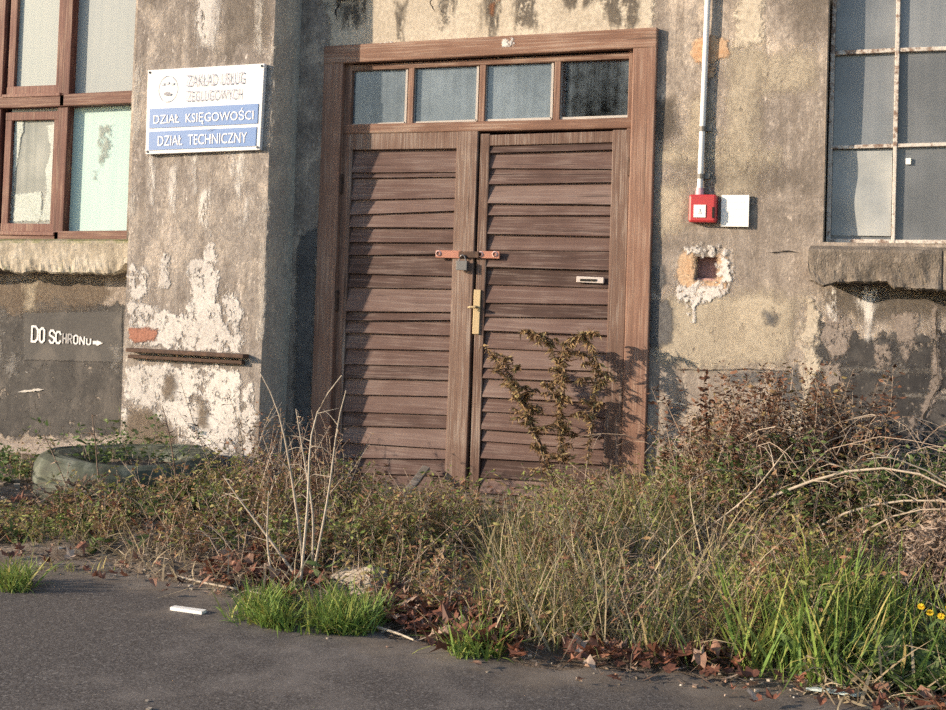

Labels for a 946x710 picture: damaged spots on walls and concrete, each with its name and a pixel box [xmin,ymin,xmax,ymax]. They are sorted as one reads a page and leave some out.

water stain [336,0,366,27]
water stain [484,0,500,37]
water stain [515,0,537,27]
water stain [563,0,589,9]
water stain [604,0,638,28]
flaking render [657,0,815,195]
flaking render [658,184,687,235]
peeling [0,234,265,466]
peeling [651,250,946,487]